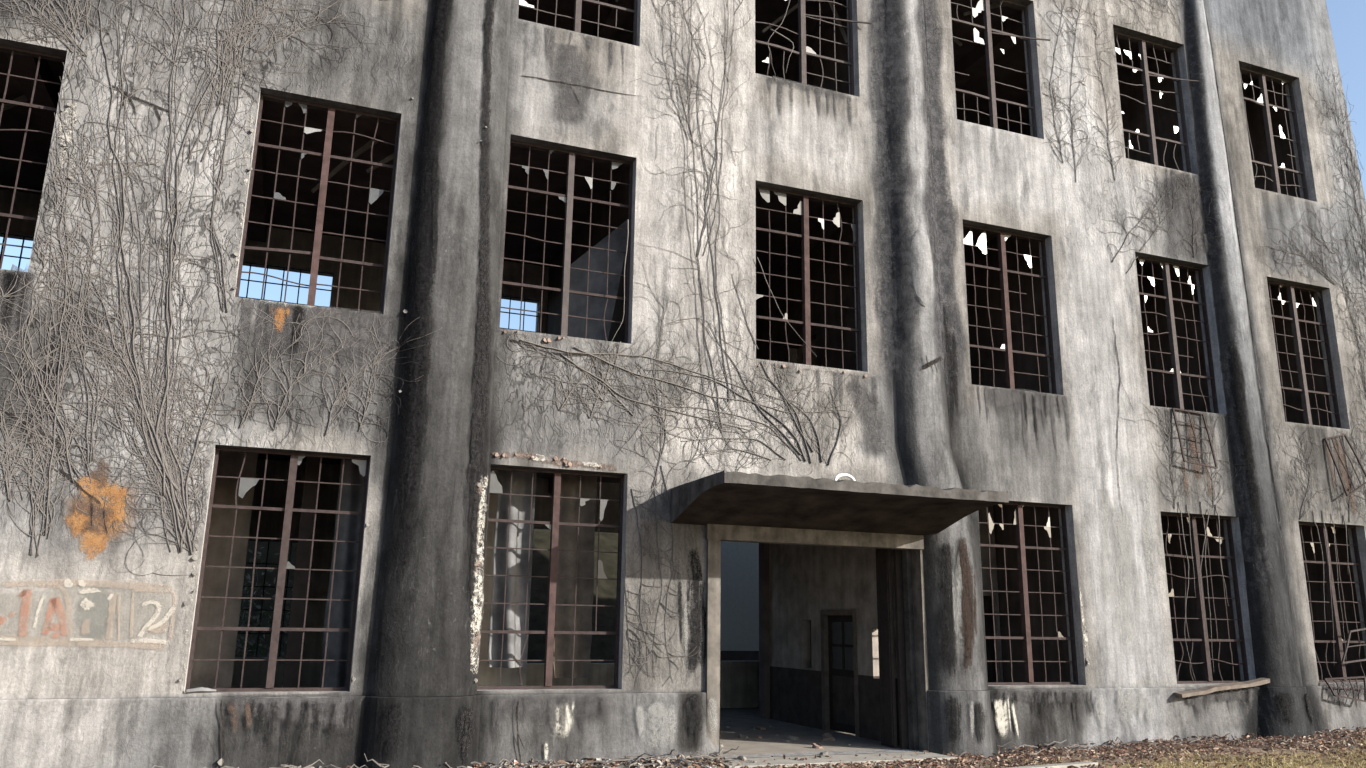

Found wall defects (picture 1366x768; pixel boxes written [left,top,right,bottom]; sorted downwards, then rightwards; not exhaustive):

leakage [816,0,964,454]
leakage [239,0,453,607]
leakage [462,0,496,622]
leakage [978,386,1070,452]
rust [67,461,127,558]
flaking render [471,477,488,683]
leakage [678,549,706,673]
leakage [936,543,964,677]
leakage [229,692,356,755]
leakage [946,688,1153,752]